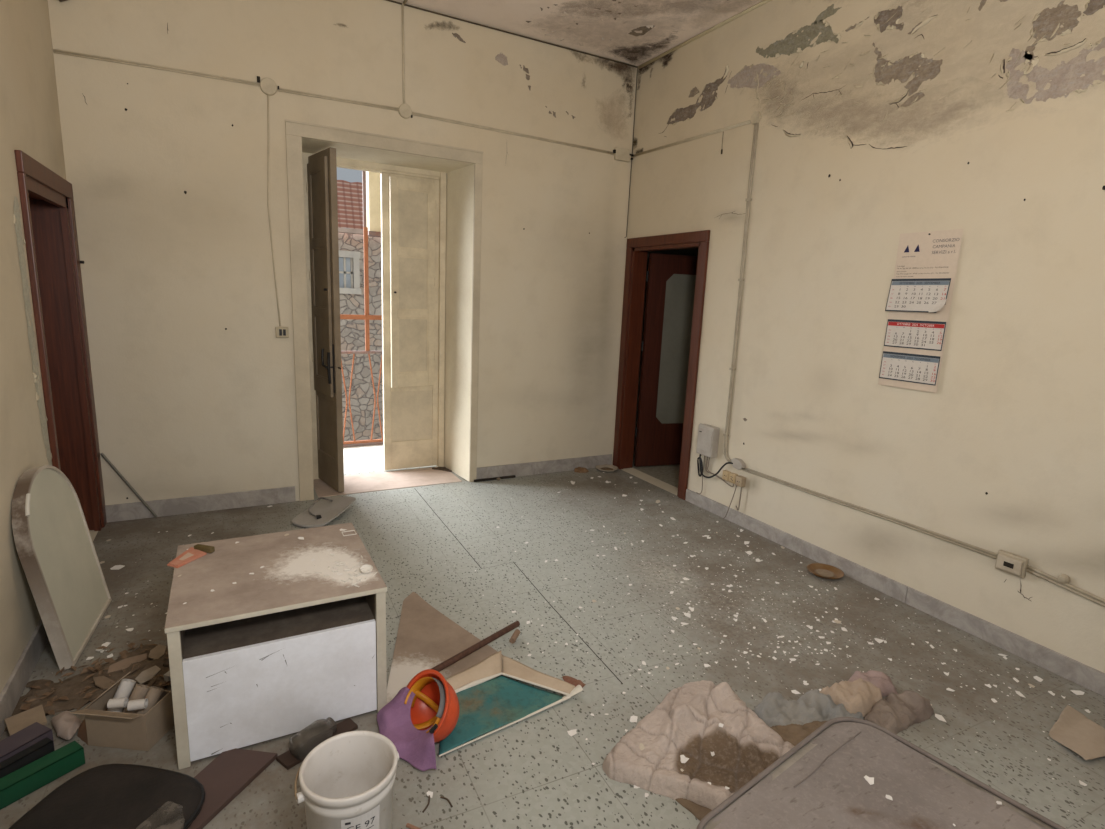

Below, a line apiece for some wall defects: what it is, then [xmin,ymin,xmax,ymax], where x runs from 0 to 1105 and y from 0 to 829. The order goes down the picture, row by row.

damp [597,15,678,91]
peeling [667,4,943,125]
peeling [1006,0,1105,104]